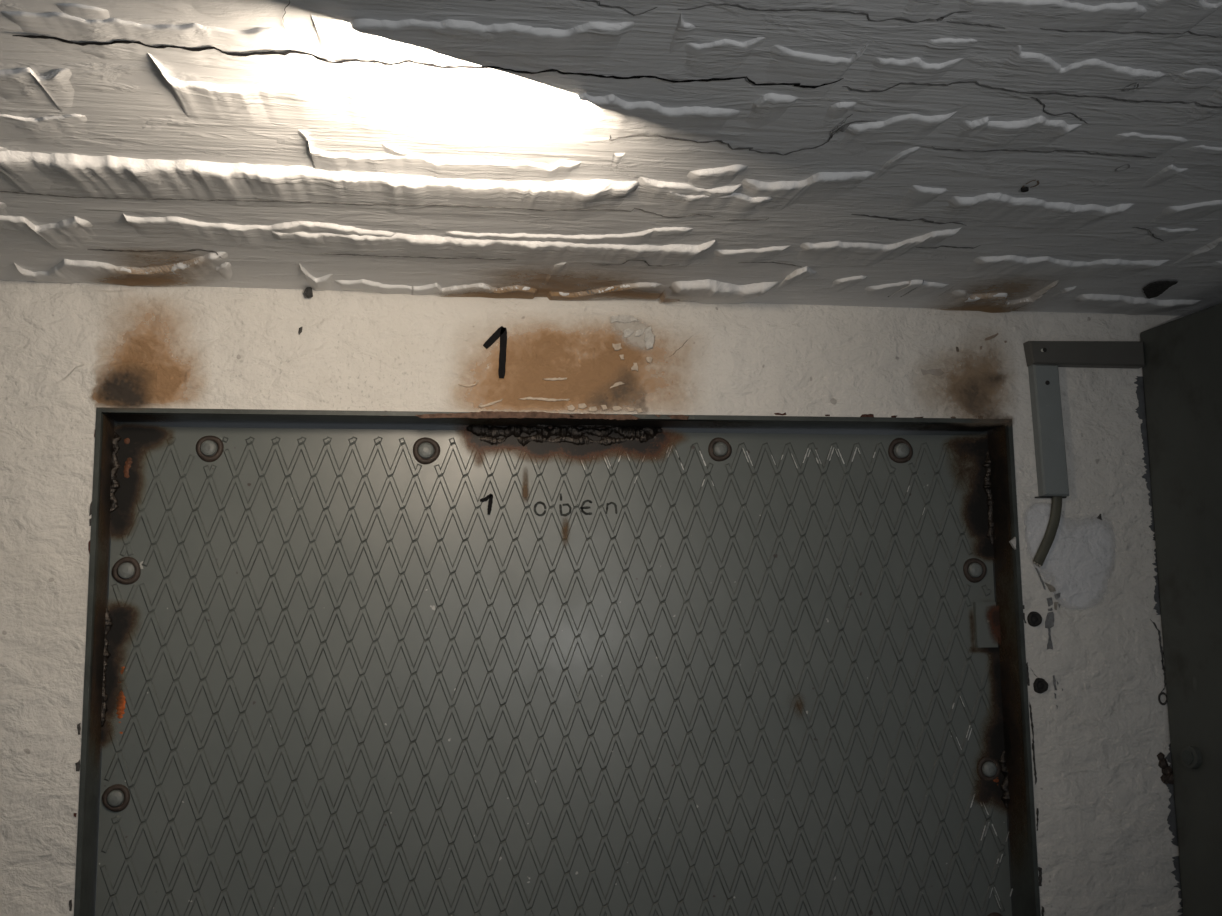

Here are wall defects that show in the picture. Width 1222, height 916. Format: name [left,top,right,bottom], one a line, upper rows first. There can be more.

crack [13,0,1222,158]
crack [0,191,769,221]
crack [852,214,980,249]
crack [88,249,223,259]
crack [330,253,516,261]
crack [580,260,678,295]
peeling [1142,281,1178,299]
corrosion [92,313,191,408]
corrosion [416,328,673,420]
corrosion [940,333,1012,424]